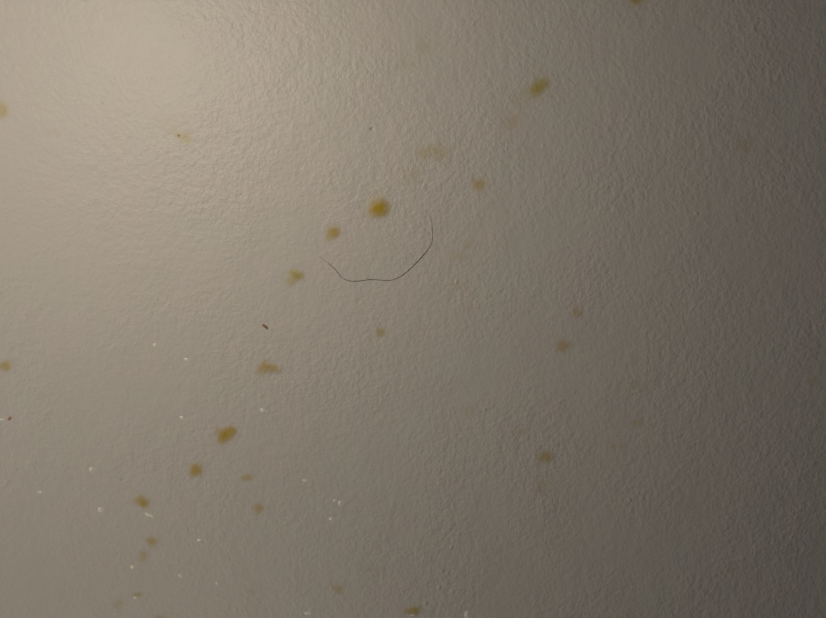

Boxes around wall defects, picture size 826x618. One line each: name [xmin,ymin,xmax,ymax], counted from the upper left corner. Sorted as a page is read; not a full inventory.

water stain [355,185,396,223]
water stain [212,422,240,448]